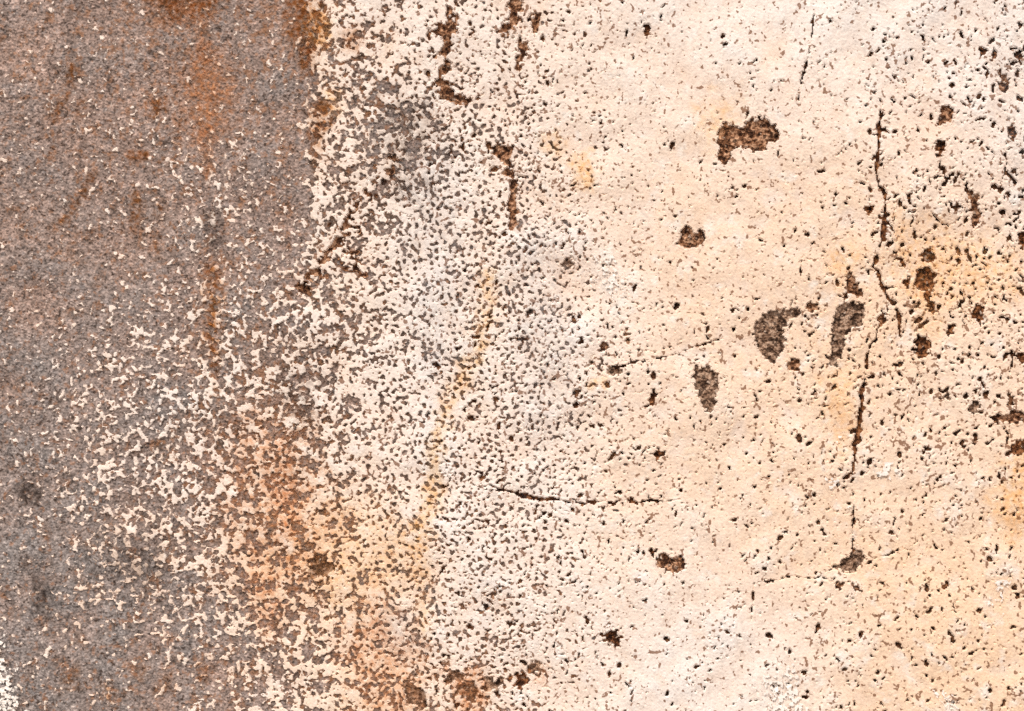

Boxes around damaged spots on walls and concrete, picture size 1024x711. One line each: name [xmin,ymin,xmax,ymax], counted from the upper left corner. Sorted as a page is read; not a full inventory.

crack [473,482,672,507]
spalling [618,0,1024,608]
crack [736,99,918,619]